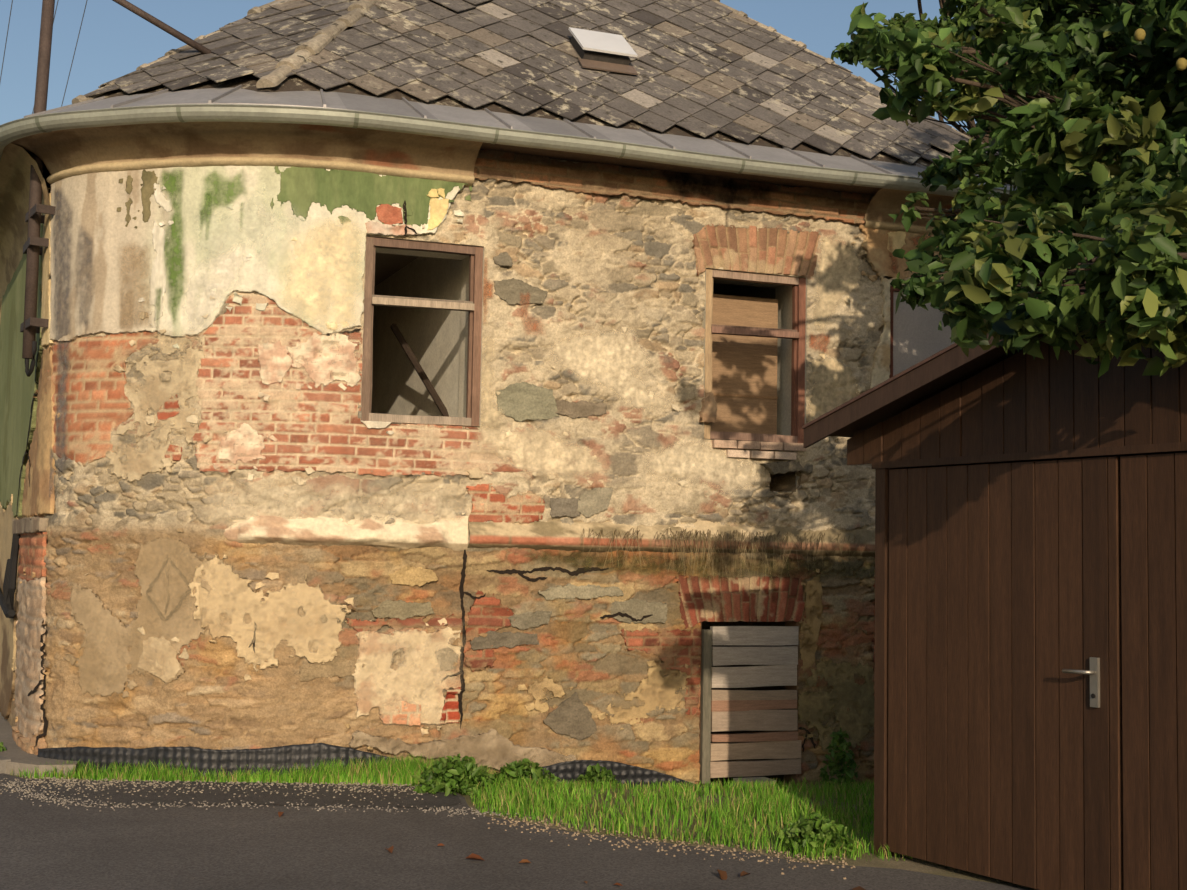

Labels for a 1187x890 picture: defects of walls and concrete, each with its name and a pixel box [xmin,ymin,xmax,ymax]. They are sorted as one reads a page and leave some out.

flaking render [0,166,601,736]
crack [28,626,48,747]
crack [441,550,609,729]
spalling [597,627,701,730]
flaking render [799,569,829,676]